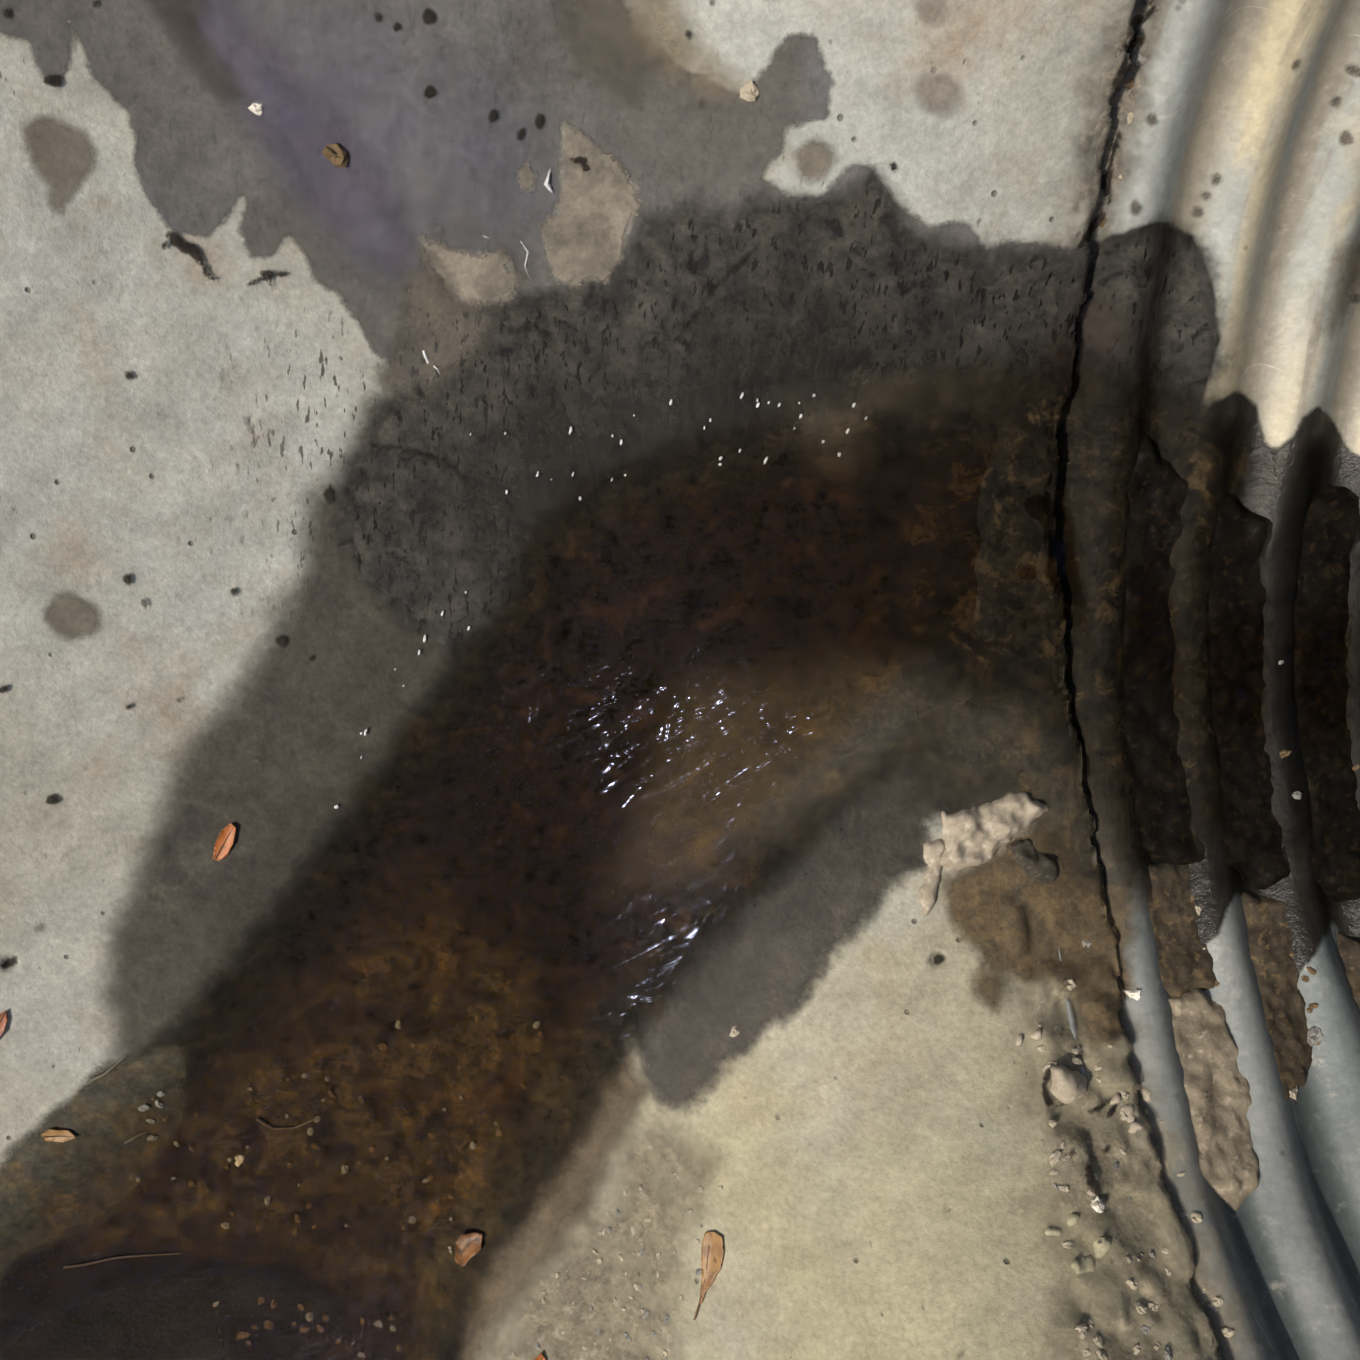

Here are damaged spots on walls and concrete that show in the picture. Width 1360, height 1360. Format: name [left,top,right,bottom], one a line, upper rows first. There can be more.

crack [1077,133,1121,249]
crack [1112,0,1157,100]
water stain [0,0,1360,1060]
spalling [918,791,1048,917]
water stain [458,725,1009,1360]
spalling [1015,984,1240,1360]